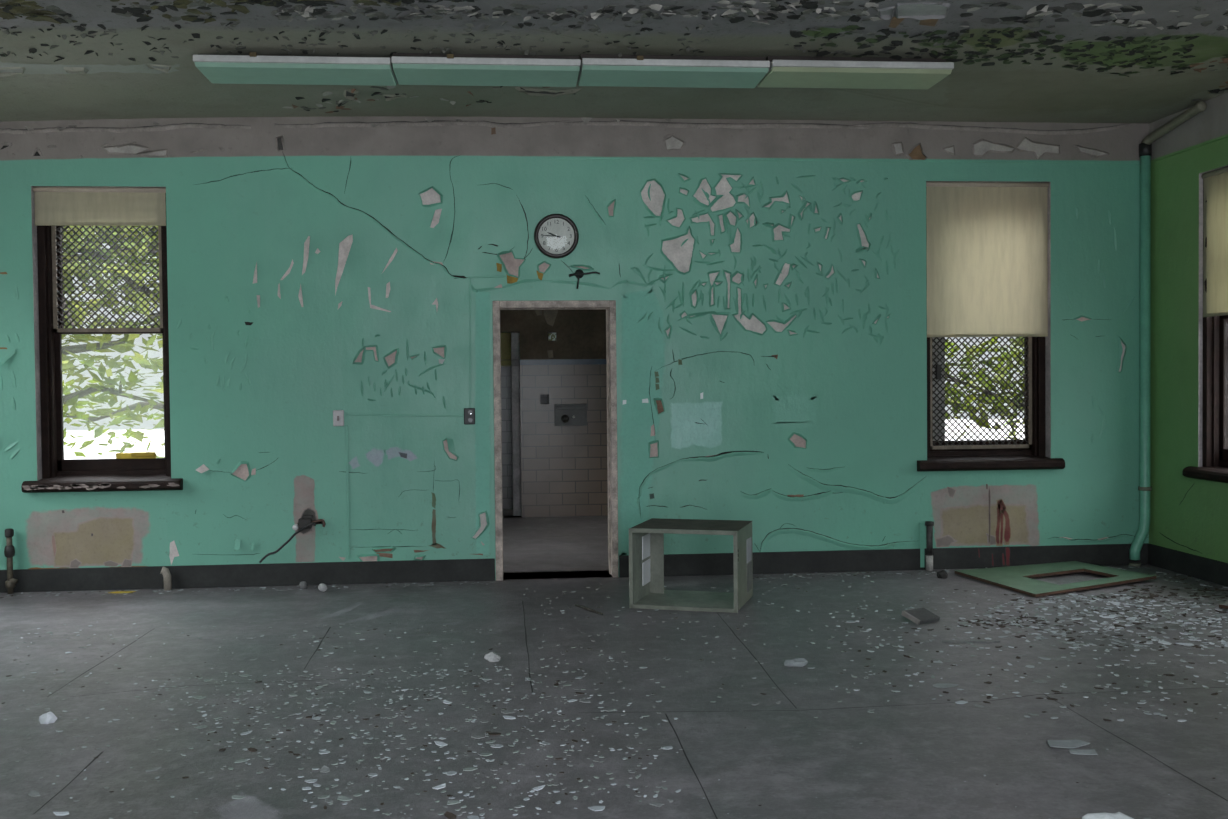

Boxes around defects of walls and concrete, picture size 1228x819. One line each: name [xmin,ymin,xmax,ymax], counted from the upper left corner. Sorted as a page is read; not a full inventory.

flaking render [0,0,1228,77]
flaking render [971,136,1109,159]
peeling [418,186,443,228]
crack [0,118,1138,280]
peeling [277,236,321,307]
peeling [335,234,353,309]
peeling [368,248,398,312]
peeling [471,173,900,345]
peeling [353,345,447,369]
flaking render [23,505,152,568]
peeling [169,541,179,565]
crack [637,451,928,552]